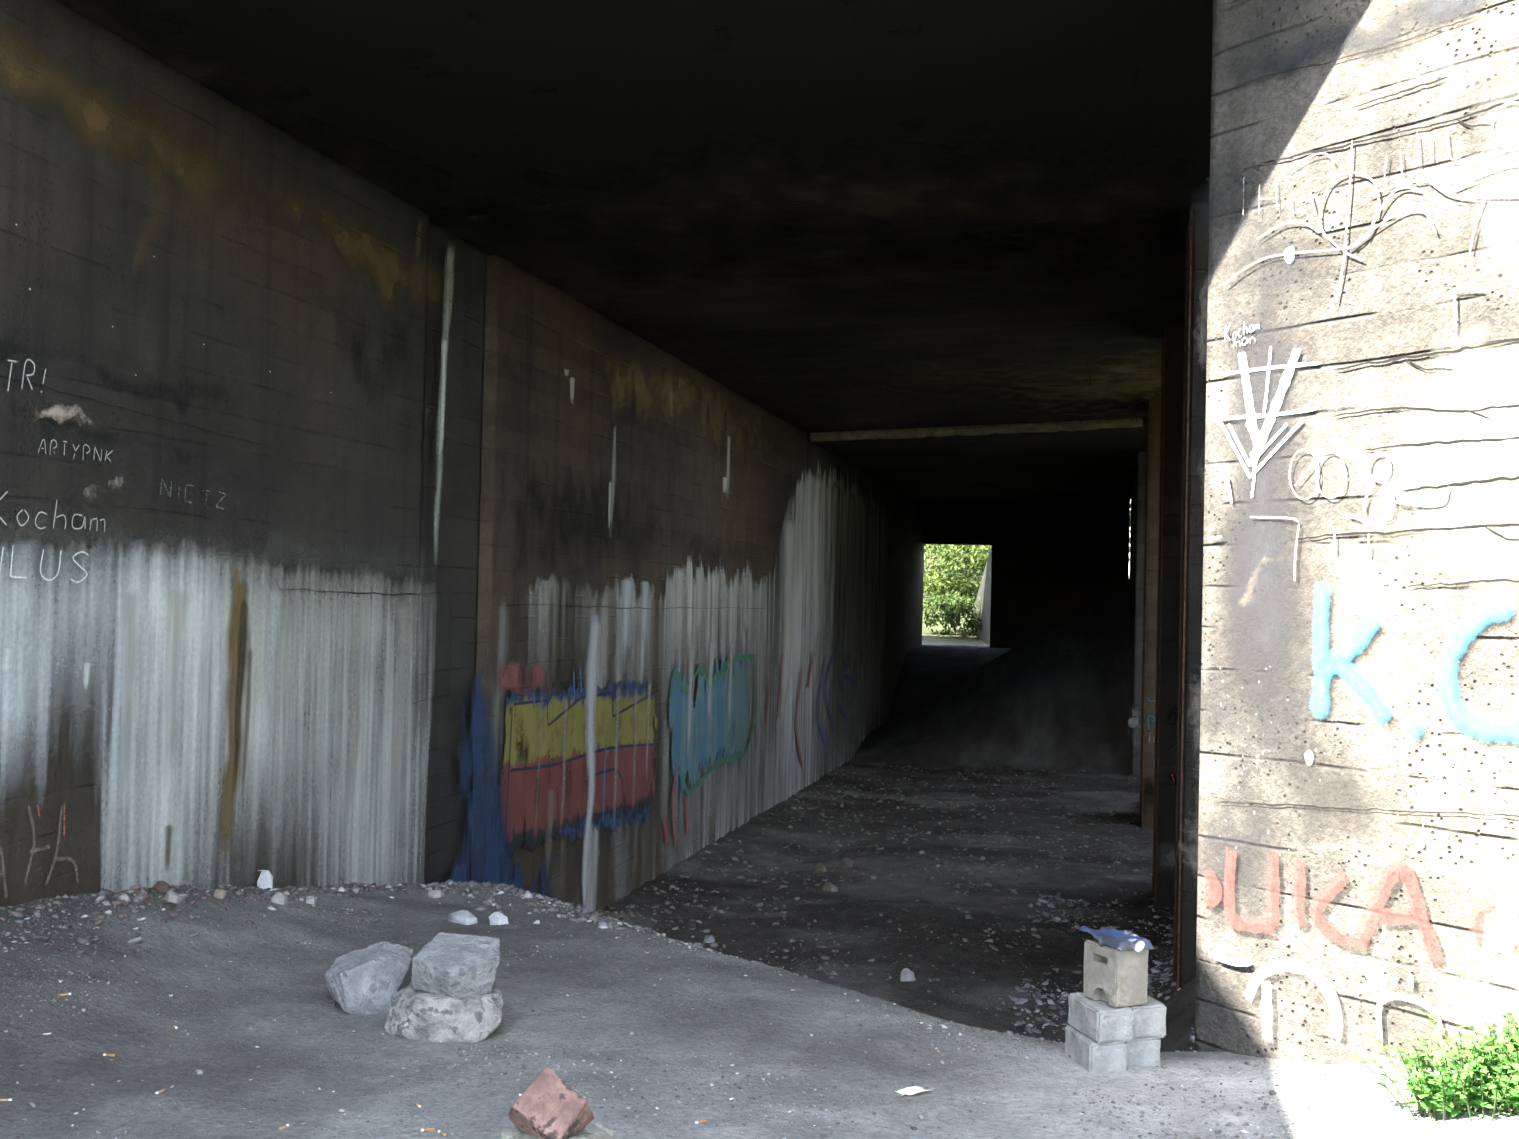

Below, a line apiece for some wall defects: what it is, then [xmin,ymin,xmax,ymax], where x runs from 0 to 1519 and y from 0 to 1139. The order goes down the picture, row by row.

water stain [0,38,222,209]
water stain [321,211,453,544]
water stain [608,428,616,525]
water stain [581,341,762,492]
corrosion [221,570,251,846]